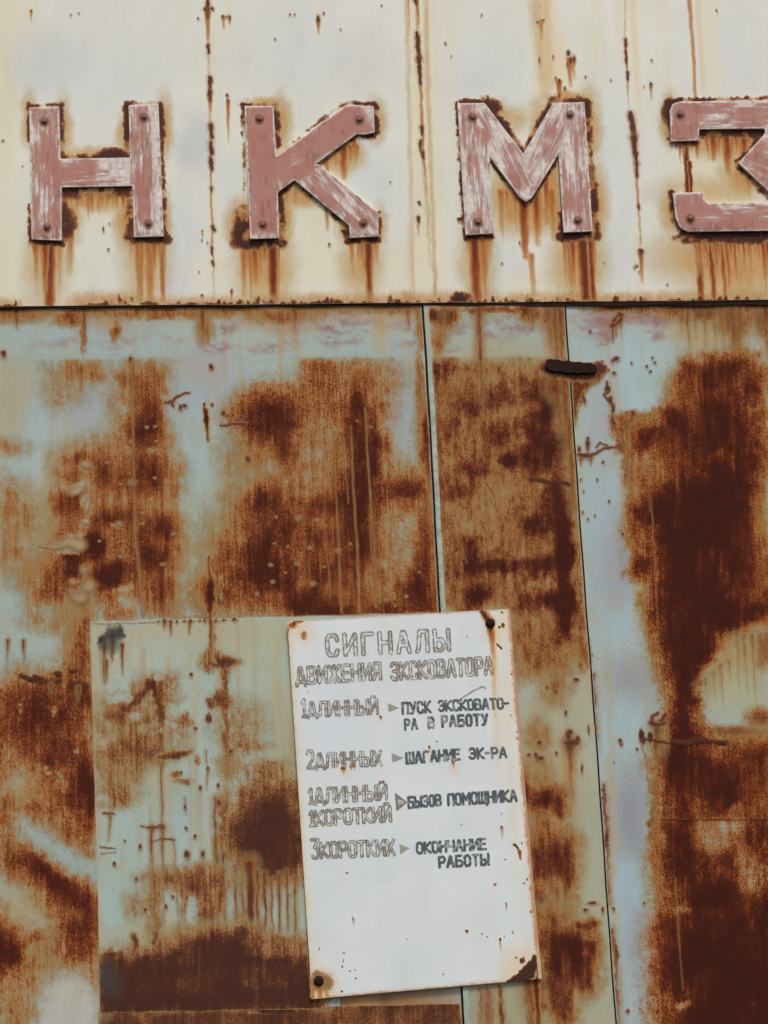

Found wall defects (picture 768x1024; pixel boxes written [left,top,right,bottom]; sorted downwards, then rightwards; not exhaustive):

peeling [22,106,153,239]
rust [203,0,214,54]
peeling [246,106,376,236]
rust [408,0,427,189]
peeling [461,50,591,233]
rust [628,110,644,280]
rust [661,0,768,199]
peeling [672,103,768,140]
peeling [675,194,768,230]
peeling [742,140,768,188]
rust [0,75,630,1024]
rust [576,188,768,1024]